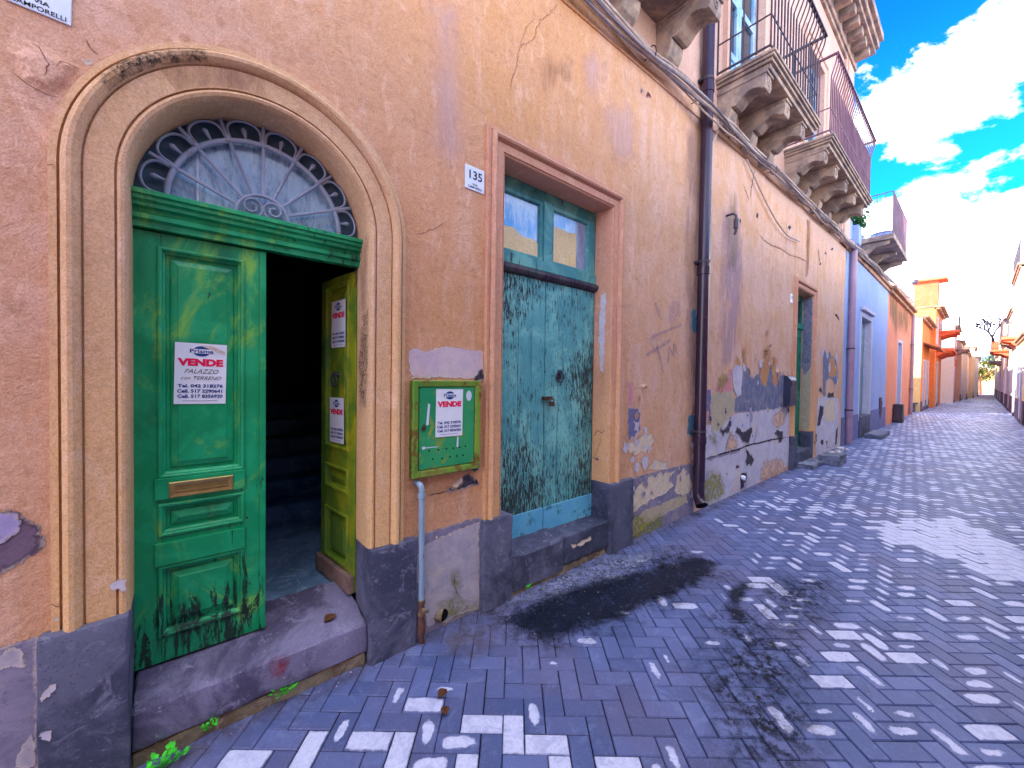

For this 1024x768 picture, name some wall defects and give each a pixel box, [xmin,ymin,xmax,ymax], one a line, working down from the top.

damp [104,48,208,87]
crack [509,5,557,96]
flaking render [408,346,484,381]
flaking render [623,297,840,536]
spalling [431,468,481,495]
spalling [0,509,47,575]